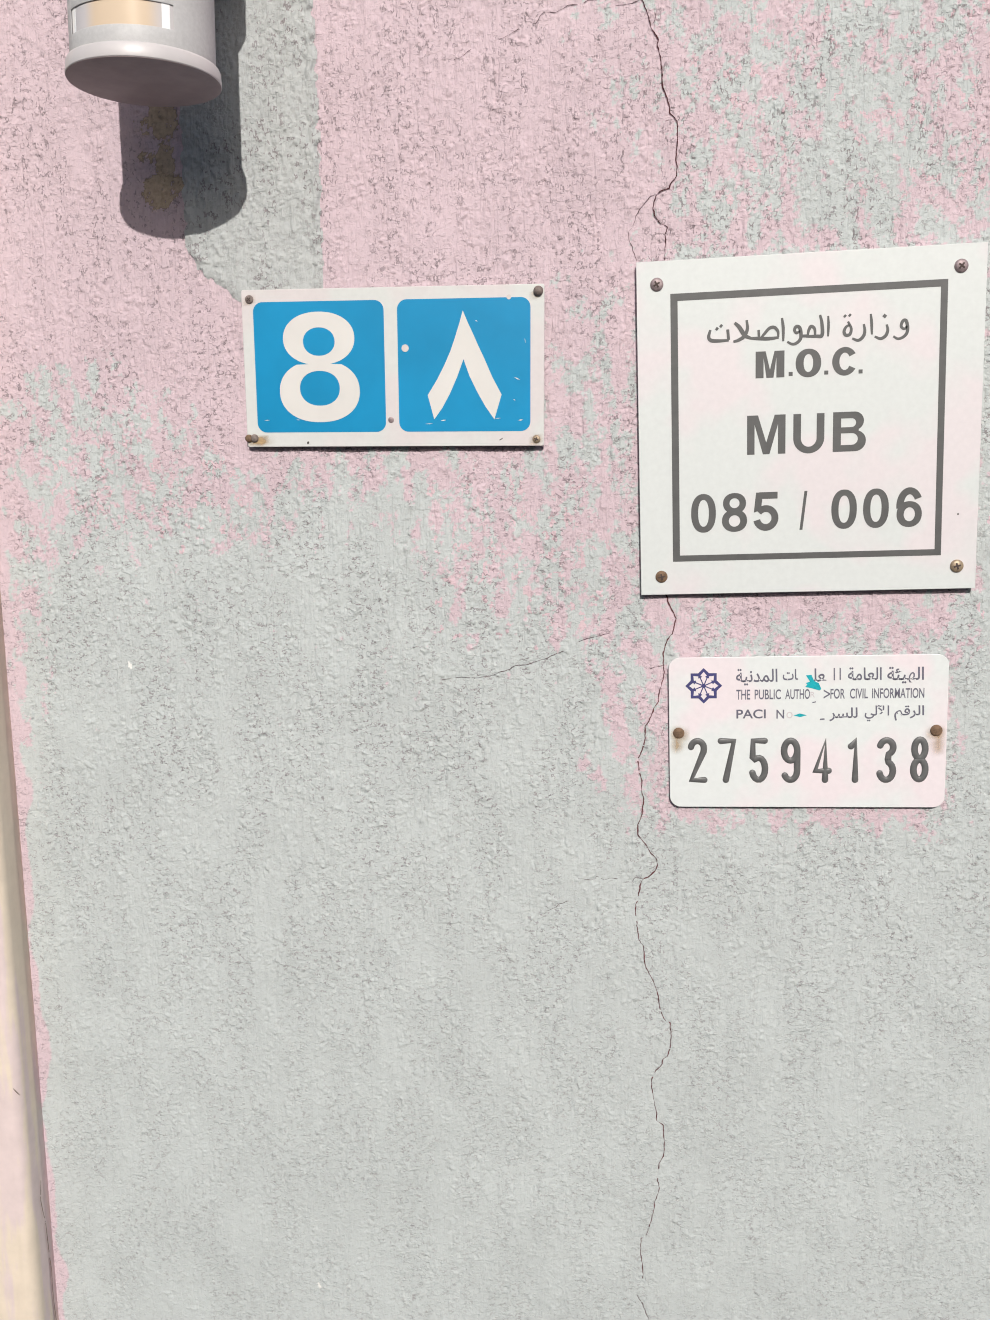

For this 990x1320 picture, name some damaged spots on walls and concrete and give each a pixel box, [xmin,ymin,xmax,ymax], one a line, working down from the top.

crack [501,0,680,261]
crack [548,595,677,1318]